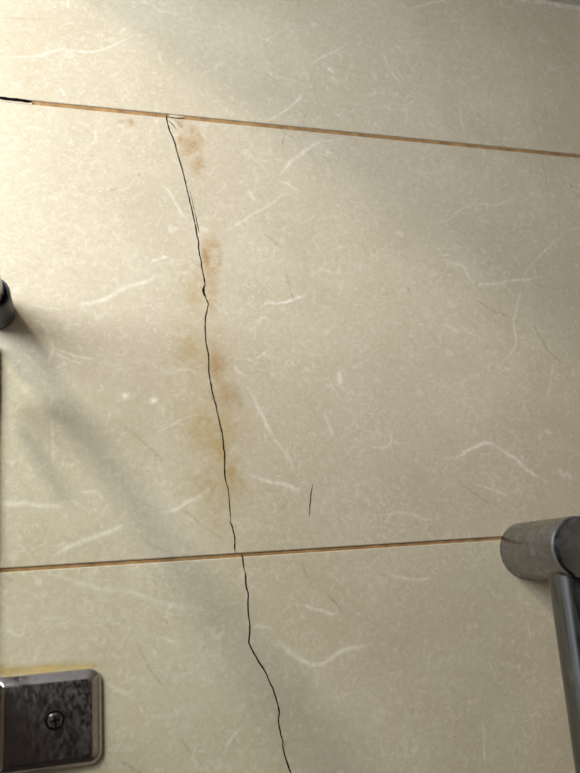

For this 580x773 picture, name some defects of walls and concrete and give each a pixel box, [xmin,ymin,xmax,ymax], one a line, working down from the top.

crack [166,115,291,773]